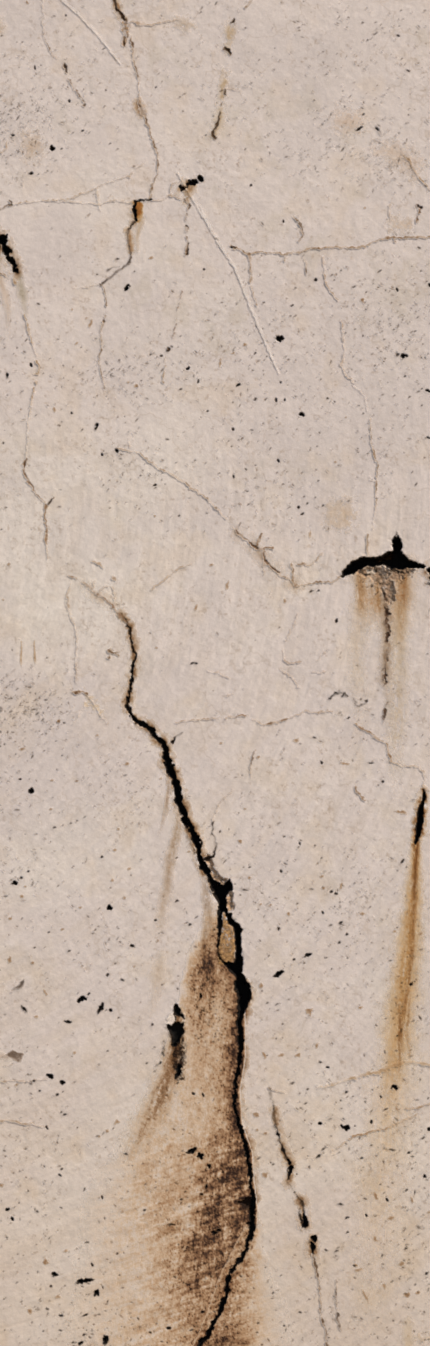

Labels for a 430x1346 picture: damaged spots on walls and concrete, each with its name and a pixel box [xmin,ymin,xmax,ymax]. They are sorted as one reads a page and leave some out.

crack [0,0,203,395]
crack [209,0,252,140]
crack [231,155,430,555]
crack [22,314,430,1346]
rust [55,901,294,1346]
rust [353,838,425,1301]